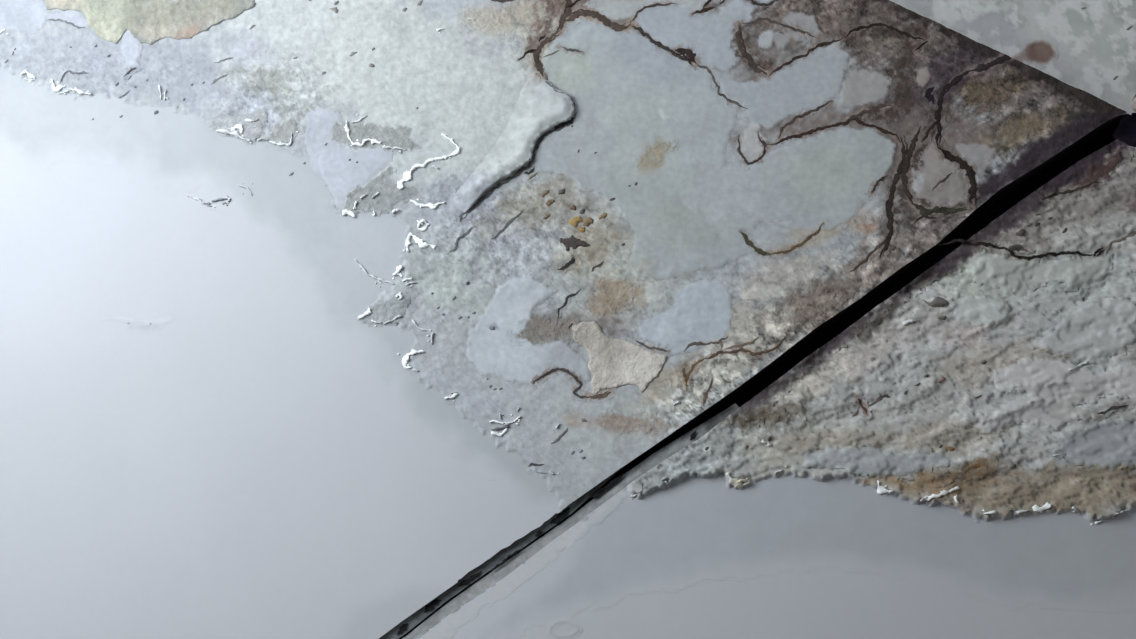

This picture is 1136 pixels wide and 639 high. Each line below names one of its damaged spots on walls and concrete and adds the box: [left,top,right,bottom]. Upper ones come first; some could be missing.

rust [457,0,555,41]
flaking render [0,0,1136,510]
crack [553,251,604,331]
crack [529,365,617,403]
crack [629,333,792,406]
crack [850,391,888,419]
crack [1091,394,1135,421]
crack [528,429,567,474]
water stain [469,474,1136,639]